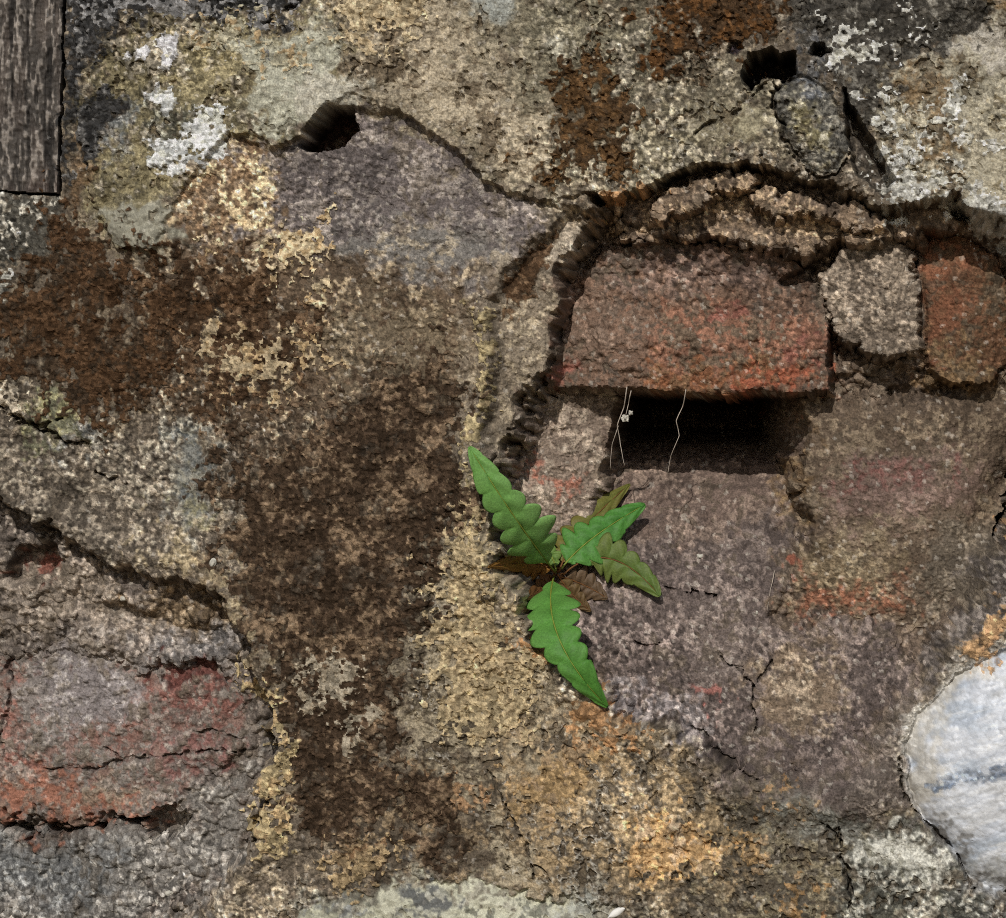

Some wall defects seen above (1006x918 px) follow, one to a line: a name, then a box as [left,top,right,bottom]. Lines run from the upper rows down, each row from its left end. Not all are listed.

leakage [47,0,311,186]
crack [694,77,888,198]
spalling [179,114,541,419]
spalling [561,165,1006,404]
crack [0,405,94,445]
spalling [408,299,984,785]
crack [992,476,1006,537]
crack [665,587,717,597]
crack [0,656,15,745]
crack [718,650,775,688]
crack [46,728,247,772]
crack [683,721,761,782]